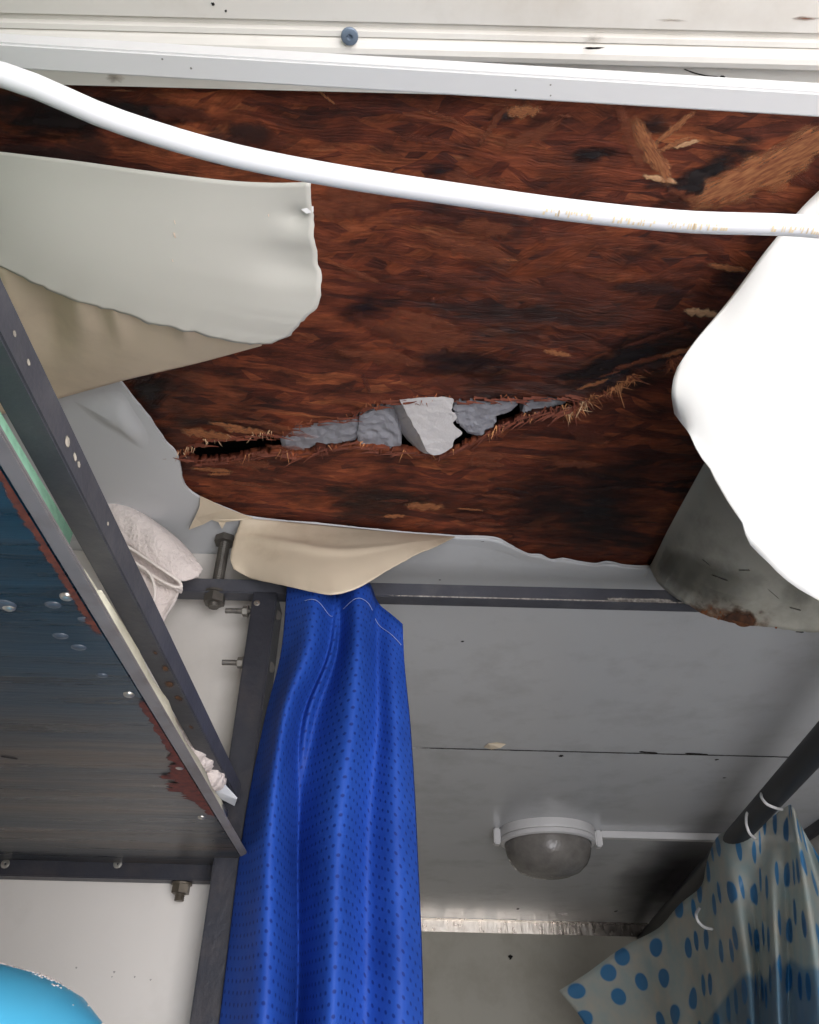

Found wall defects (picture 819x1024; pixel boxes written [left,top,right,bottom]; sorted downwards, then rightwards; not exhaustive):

peeling [189,496,455,595]
corrosion [695,606,756,626]
corrosion [139,701,214,816]